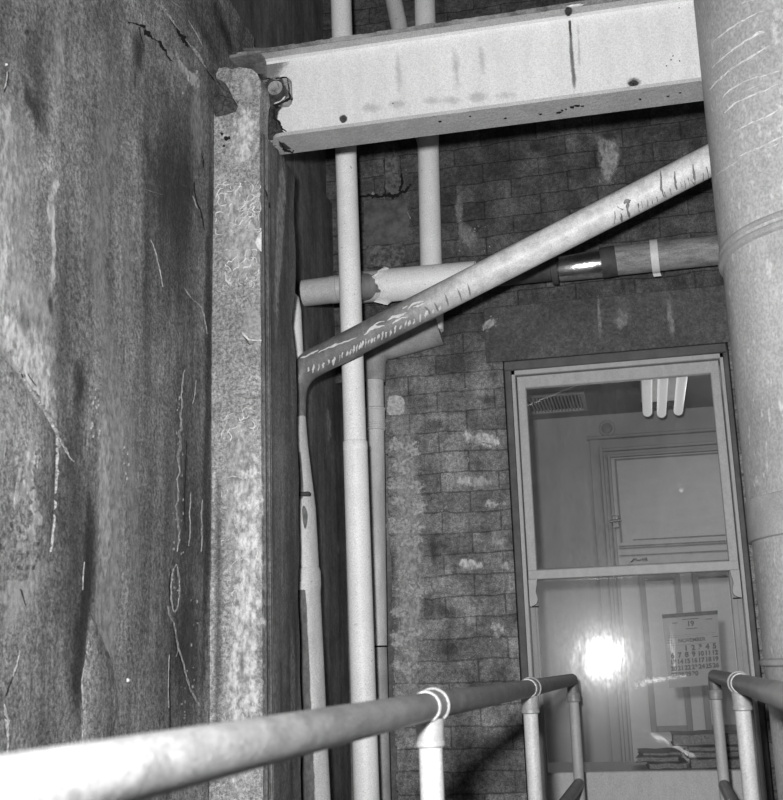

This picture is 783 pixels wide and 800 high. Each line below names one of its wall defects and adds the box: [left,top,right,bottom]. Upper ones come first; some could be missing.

crack [128,0,216,82]
rust [565,4,584,85]
crack [167,606,201,730]